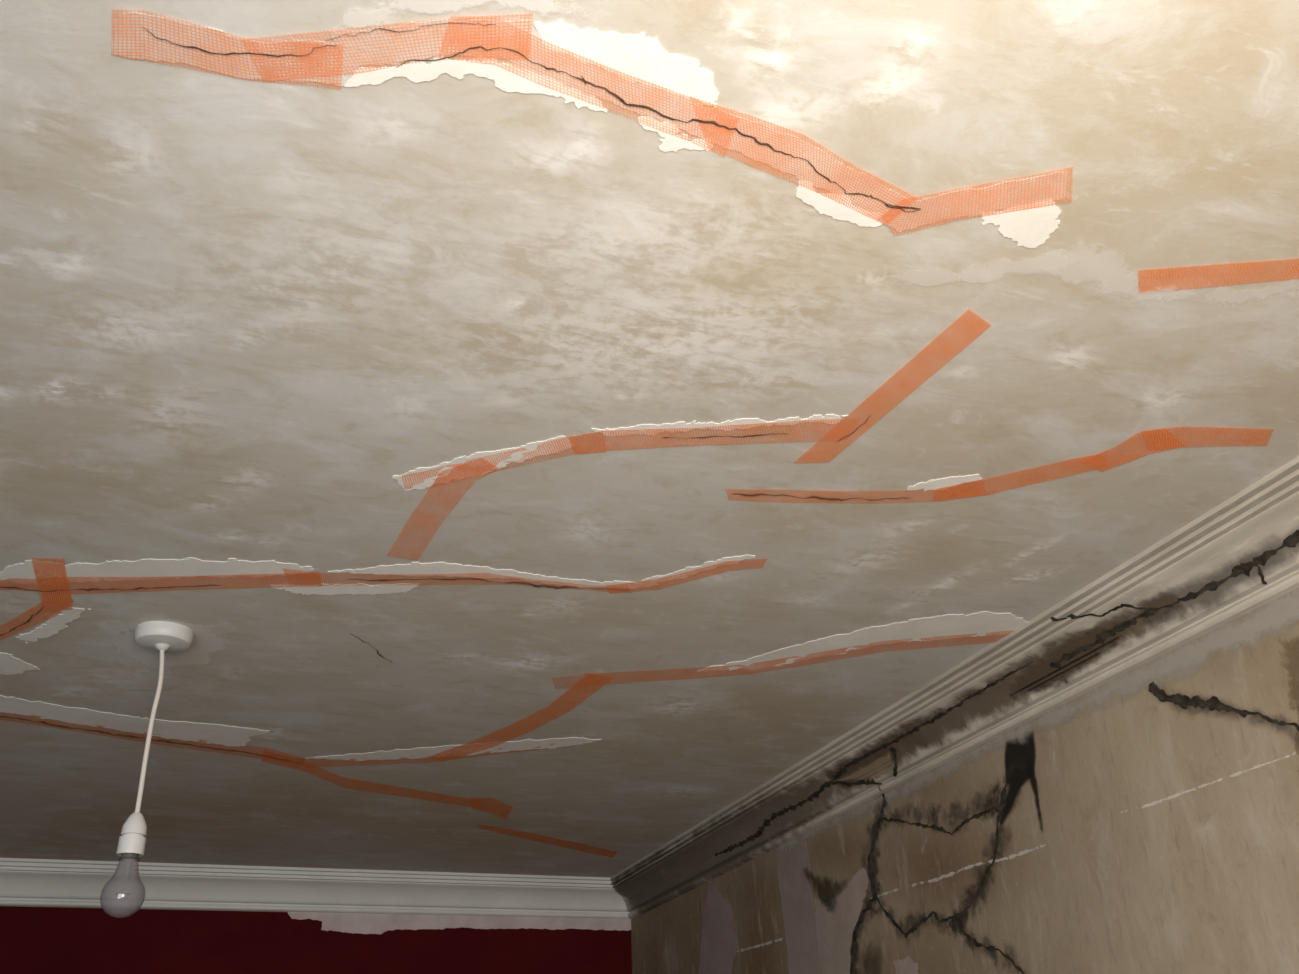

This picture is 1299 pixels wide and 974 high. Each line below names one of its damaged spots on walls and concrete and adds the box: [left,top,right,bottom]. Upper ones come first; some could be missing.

crack [141,22,921,212]
crack [662,432,785,440]
crack [734,493,907,501]
crack [715,529,1299,974]